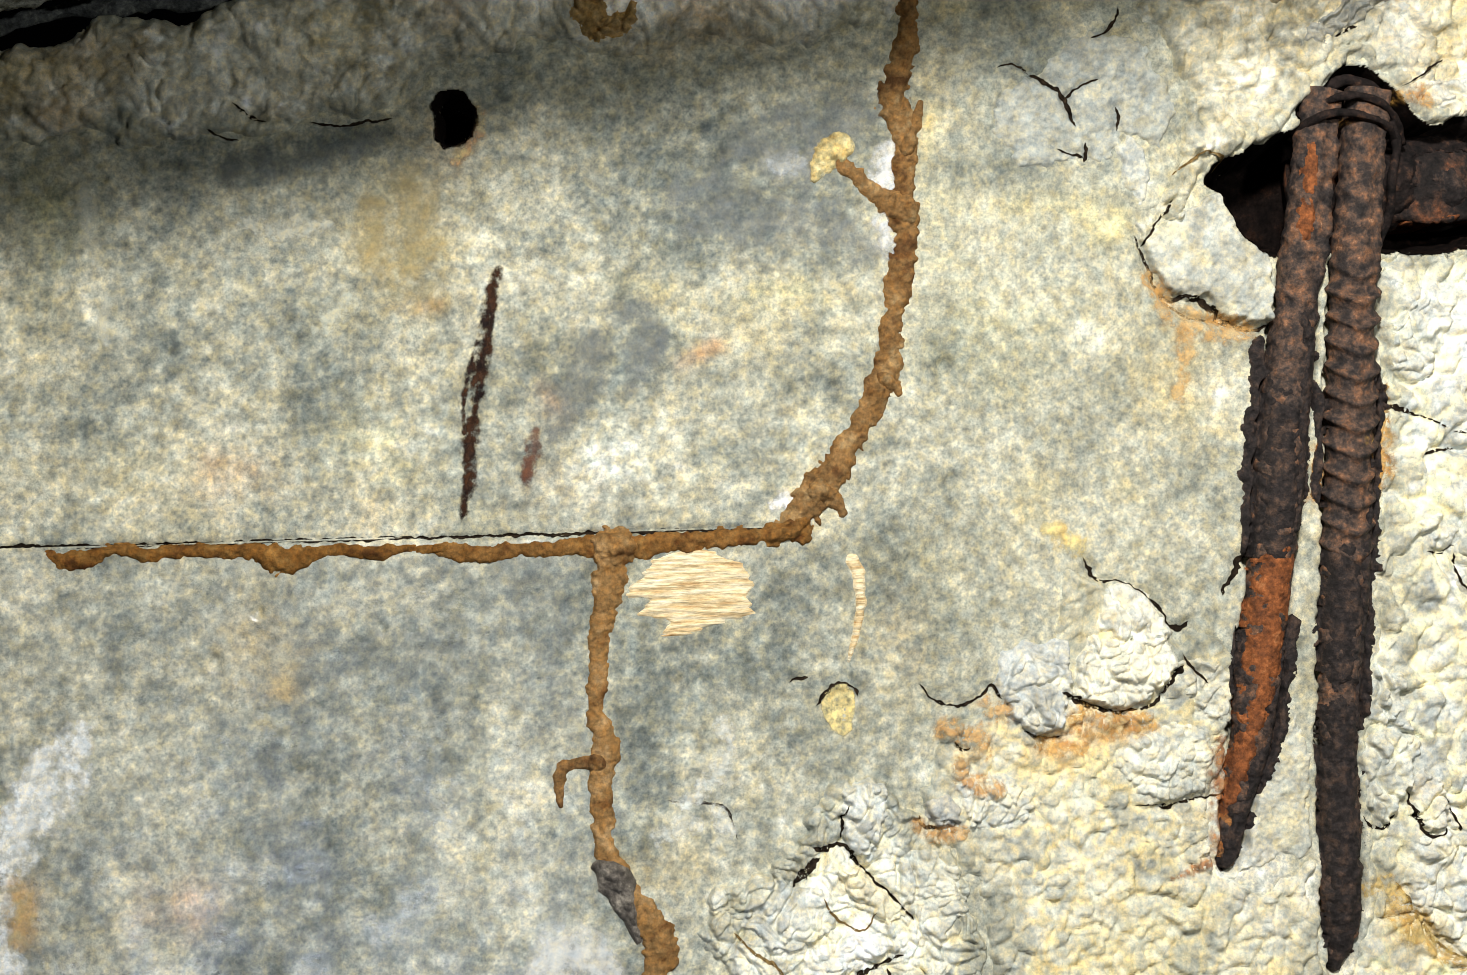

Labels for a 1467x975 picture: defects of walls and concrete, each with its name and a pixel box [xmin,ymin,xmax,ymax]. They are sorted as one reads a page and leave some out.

spalling [0,0,900,150]
crack [998,63,1120,162]
corrosion [460,266,503,519]
corrosion [521,427,541,481]
spalling [696,0,1467,975]
corrosion [1371,410,1394,491]
crack [0,528,762,549]
crack [1026,558,1208,739]
crack [920,683,1002,752]
crack [735,933,784,975]
crack [793,807,914,975]
corrosion [1362,874,1467,972]